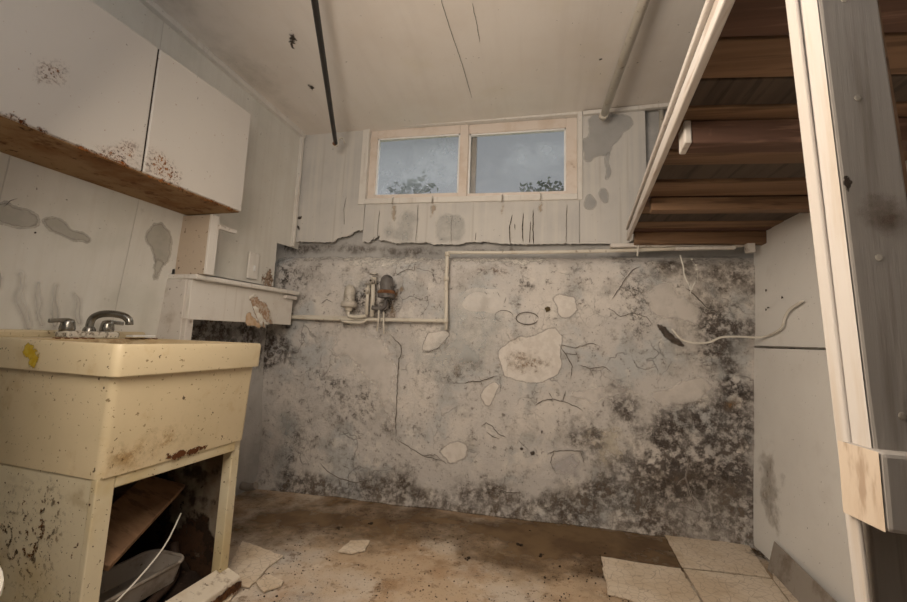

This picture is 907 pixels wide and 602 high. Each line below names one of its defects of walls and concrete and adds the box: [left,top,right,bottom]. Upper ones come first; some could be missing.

peeling [246,294,274,329]
peeling [262,269,273,287]
leakage [280,245,425,288]
crack [485,292,538,325]
crack [608,267,652,324]
leakage [656,261,747,290]
leakage [191,320,294,369]
crack [390,334,450,463]
spalling [481,328,562,406]
crack [535,343,612,410]
leakage [231,307,770,579]
crack [547,450,584,471]